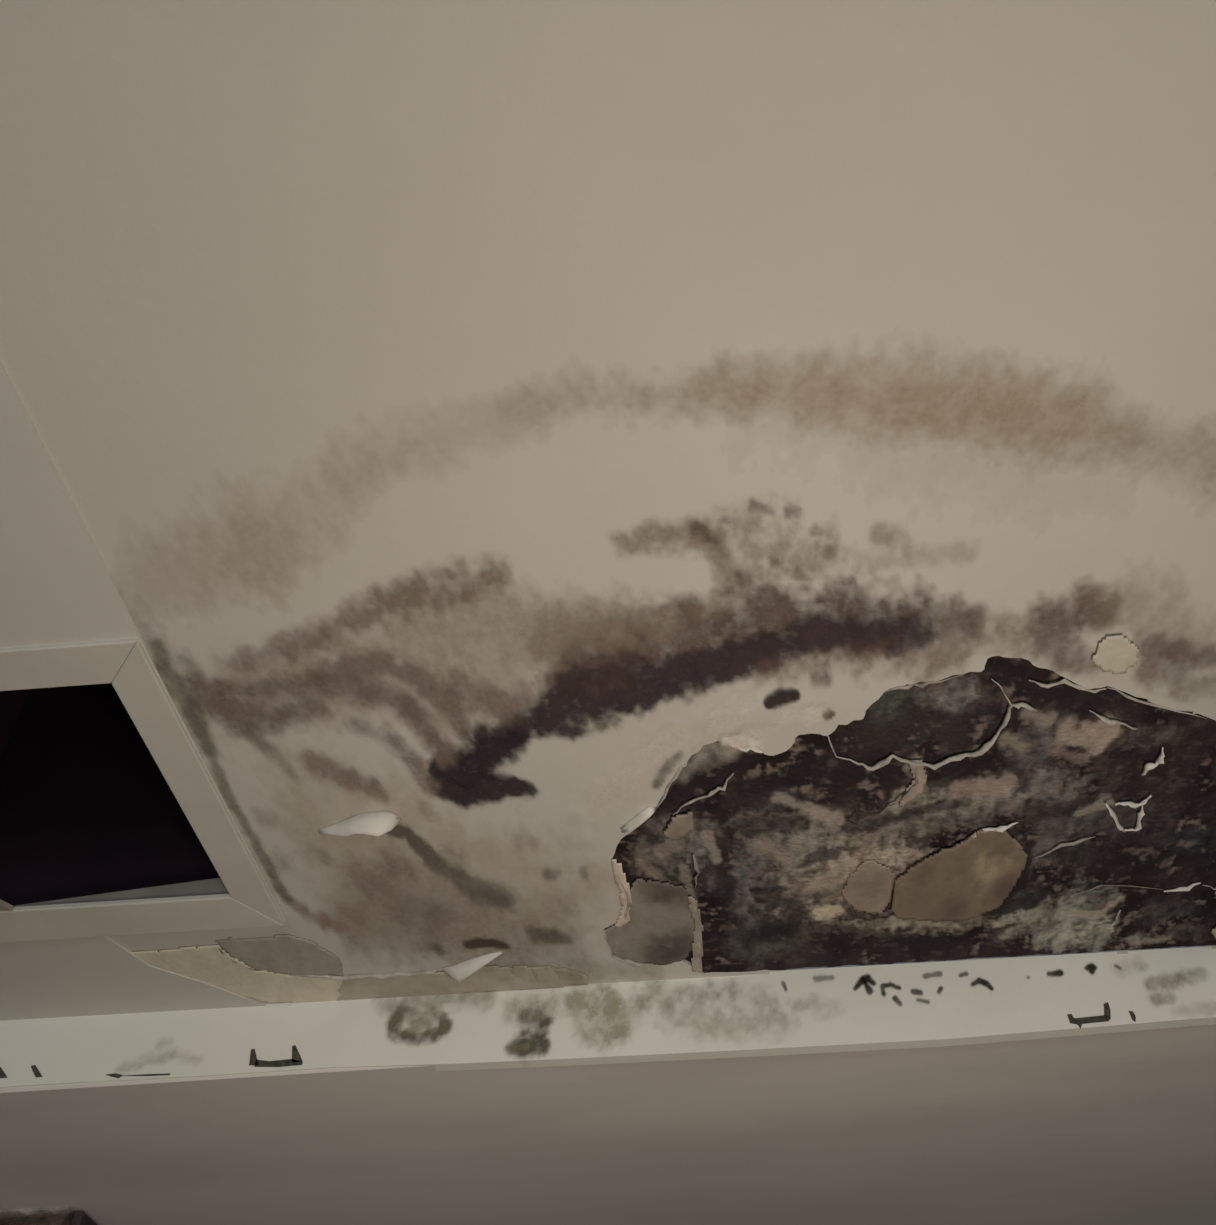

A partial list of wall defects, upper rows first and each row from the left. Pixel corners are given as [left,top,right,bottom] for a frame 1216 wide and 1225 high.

mould [1037,587,1117,669]
mould [1138,637,1216,681]
water stain [156,582,968,808]
peeling [318,810,401,836]
flaking render [602,656,1216,973]
water stain [387,826,563,954]
peeling [131,934,589,1003]
mould [388,995,451,1042]
mould [507,1006,551,1056]
water stain [567,988,628,1043]
water stain [854,975,943,1005]
water stain [960,973,994,990]